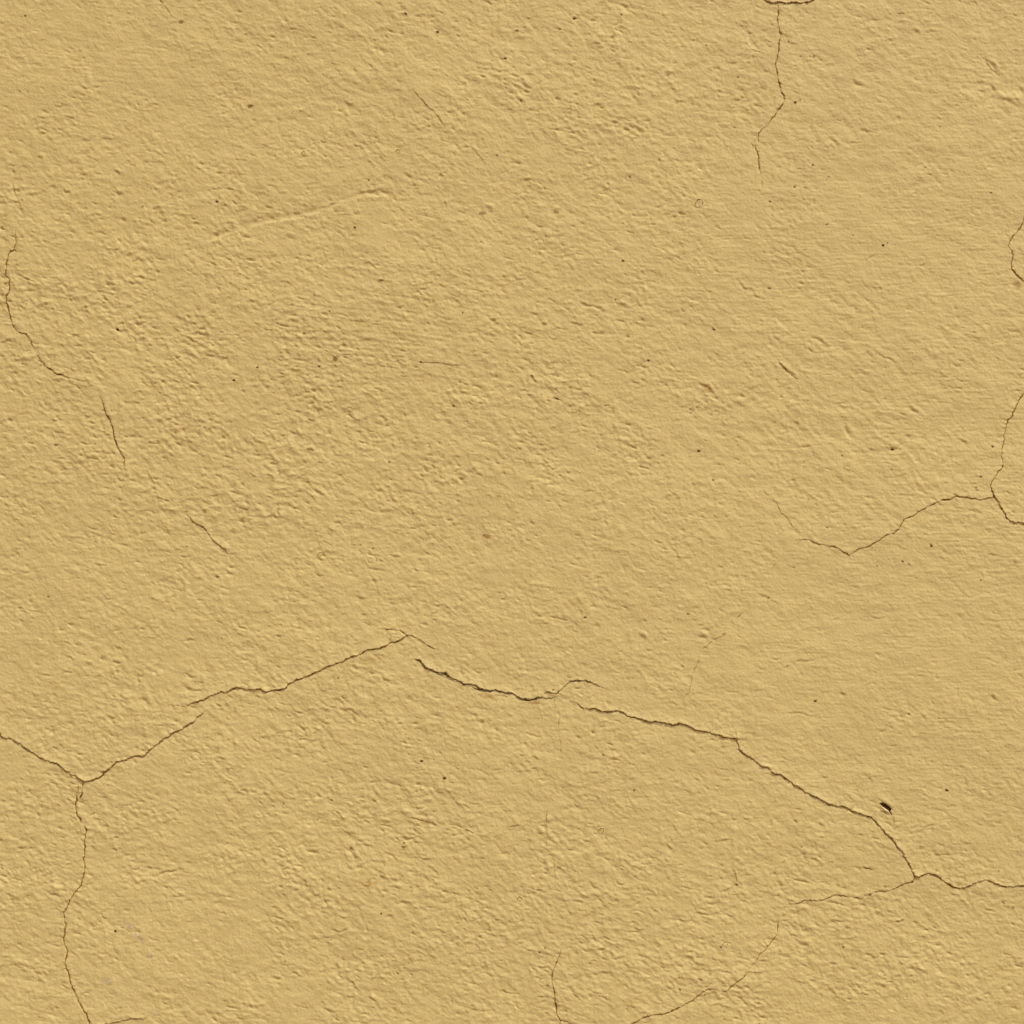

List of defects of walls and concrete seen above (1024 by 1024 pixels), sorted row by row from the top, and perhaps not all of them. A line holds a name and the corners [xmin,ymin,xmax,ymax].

crack [751,0,814,169]
crack [1008,218,1024,281]
crack [4,186,227,553]
crack [773,394,1023,556]
crack [0,614,1024,1024]